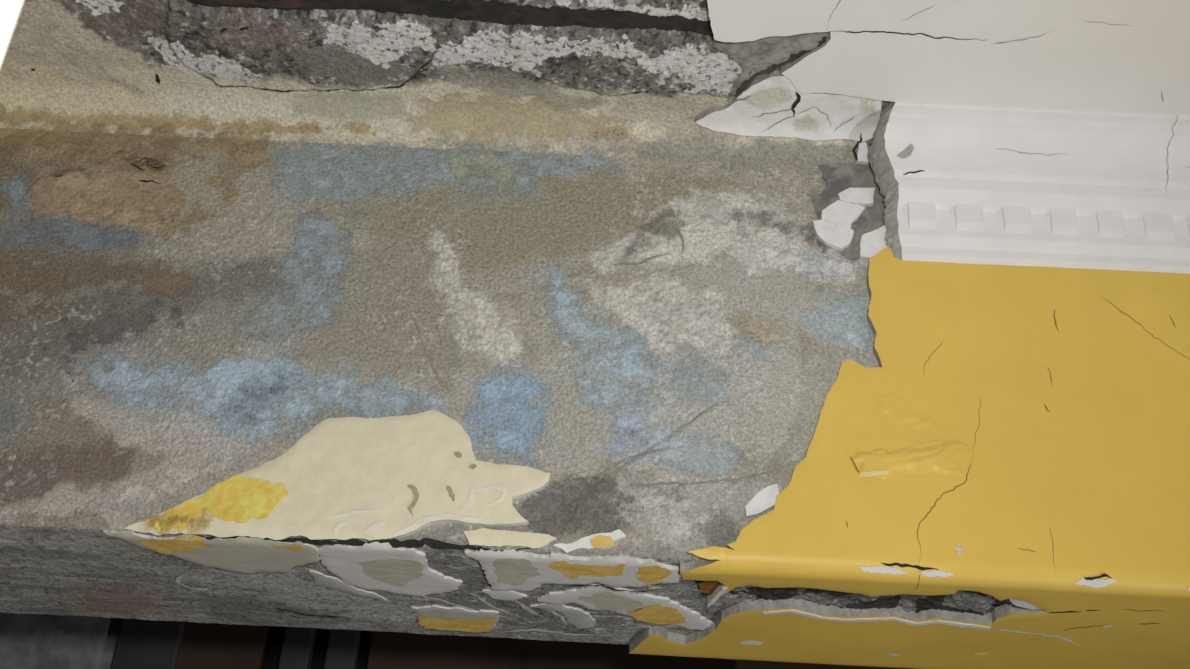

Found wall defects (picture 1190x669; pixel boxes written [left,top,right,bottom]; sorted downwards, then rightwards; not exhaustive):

crack [828,0,1052,44]
spalling [0,0,887,263]
crack [695,71,882,142]
crack [1161,91,1190,192]
flaking render [0,121,1040,645]
crack [916,398,981,589]
flaking render [763,610,1080,647]